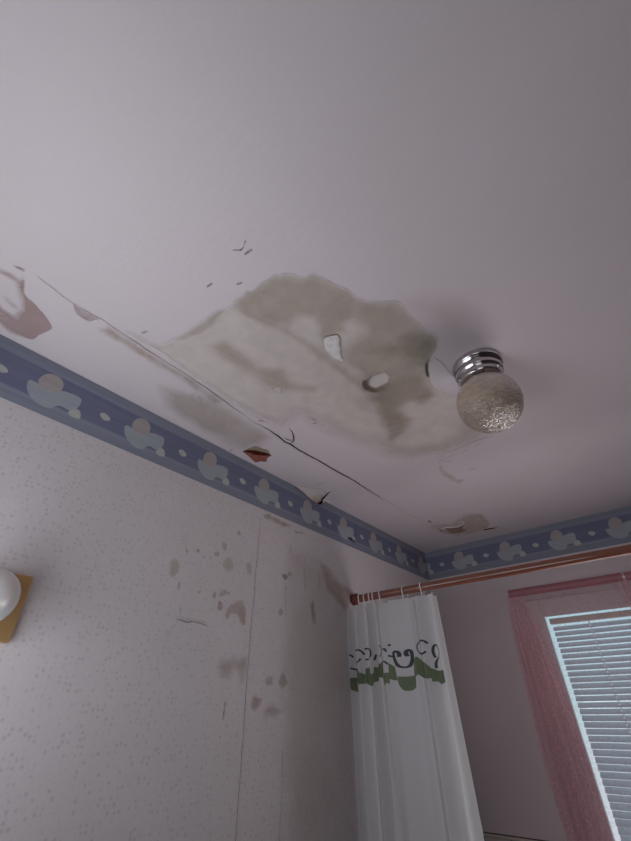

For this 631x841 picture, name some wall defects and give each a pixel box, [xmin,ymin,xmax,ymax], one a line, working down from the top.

crack [41,279,405,512]
spalling [241,446,272,464]
peeling [143,273,472,452]
peeling [440,515,498,535]